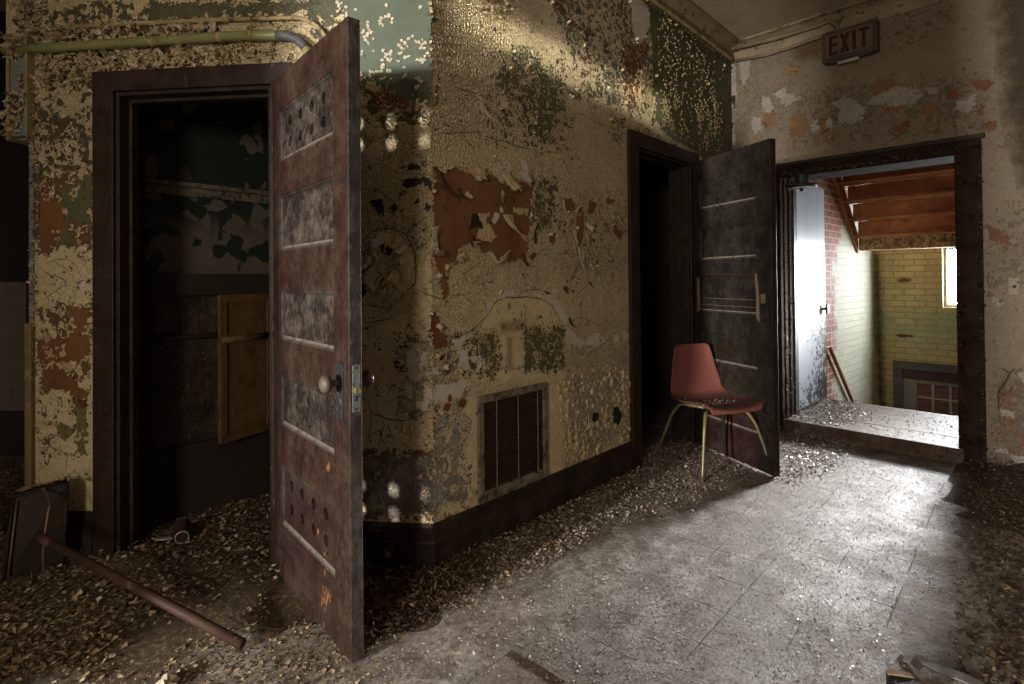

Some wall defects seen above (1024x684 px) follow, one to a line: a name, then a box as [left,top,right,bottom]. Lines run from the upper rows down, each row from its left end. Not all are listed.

peeling [0,0,277,312]
peeling [474,0,519,22]
peeling [476,42,585,143]
peeling [547,0,751,155]
flaking render [751,78,997,151]
crack [362,188,622,337]
peeling [400,153,629,370]
peeling [28,302,93,455]
peeling [366,309,507,522]
spalling [612,404,623,427]
flaking render [978,215,1024,464]